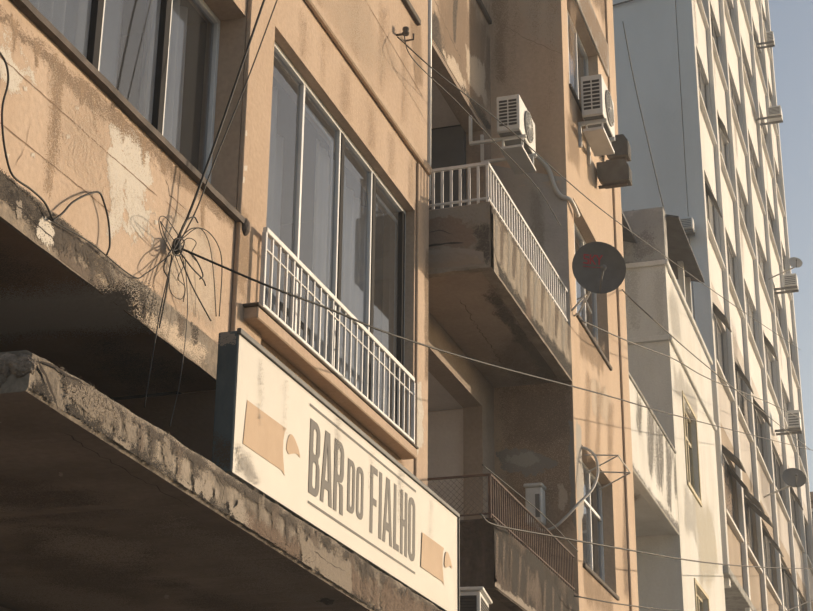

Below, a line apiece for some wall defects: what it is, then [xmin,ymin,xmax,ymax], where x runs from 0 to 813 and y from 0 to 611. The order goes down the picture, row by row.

water stain [432,0,522,133]
water stain [565,0,608,175]
spalling [36,216,104,291]
water stain [0,5,251,304]
peeling [106,122,158,250]
water stain [519,180,564,254]
water stain [177,315,200,345]
peeling [66,382,131,450]
water stain [429,203,615,611]
spalling [178,476,220,502]
spalling [229,500,253,529]
water stain [622,390,719,601]